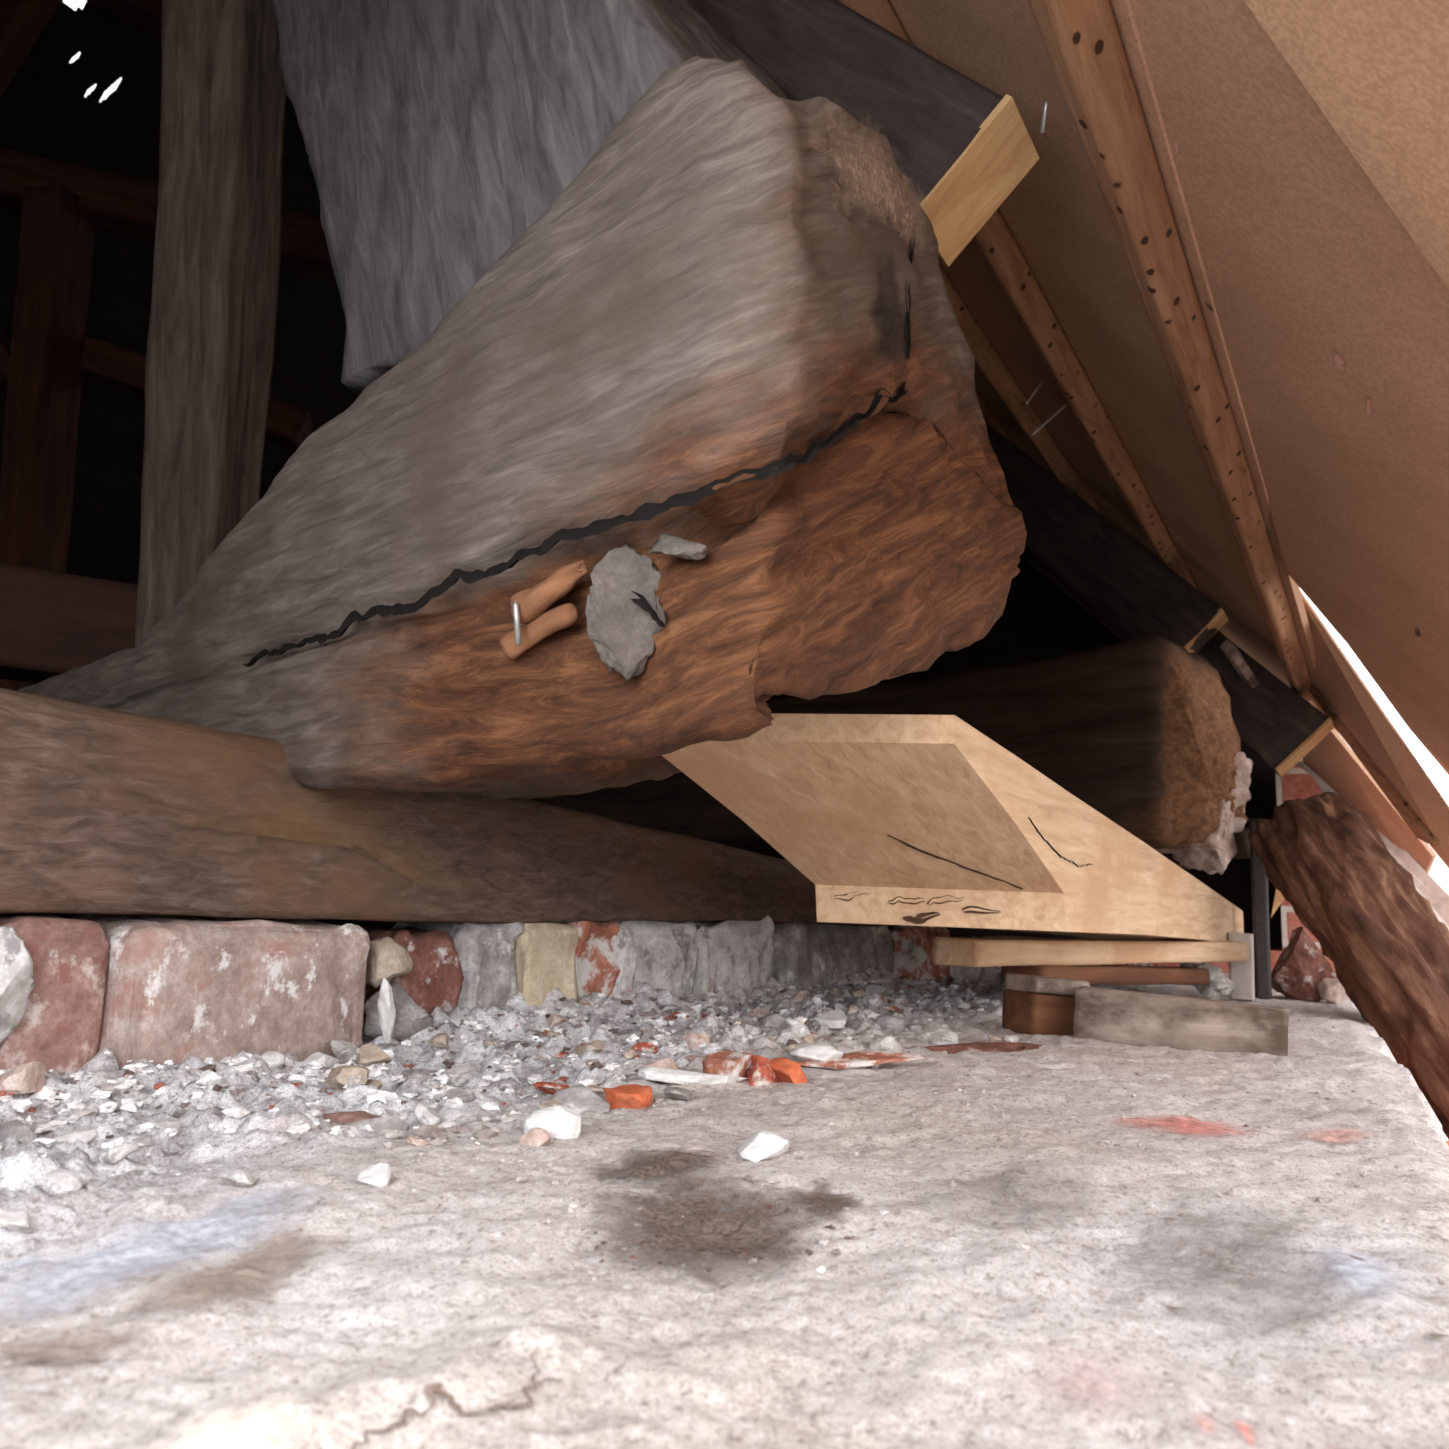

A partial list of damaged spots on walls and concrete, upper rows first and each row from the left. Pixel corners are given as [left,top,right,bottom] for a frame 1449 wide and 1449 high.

damp [594,1148,859,1282]
crack [317,1344,565,1449]